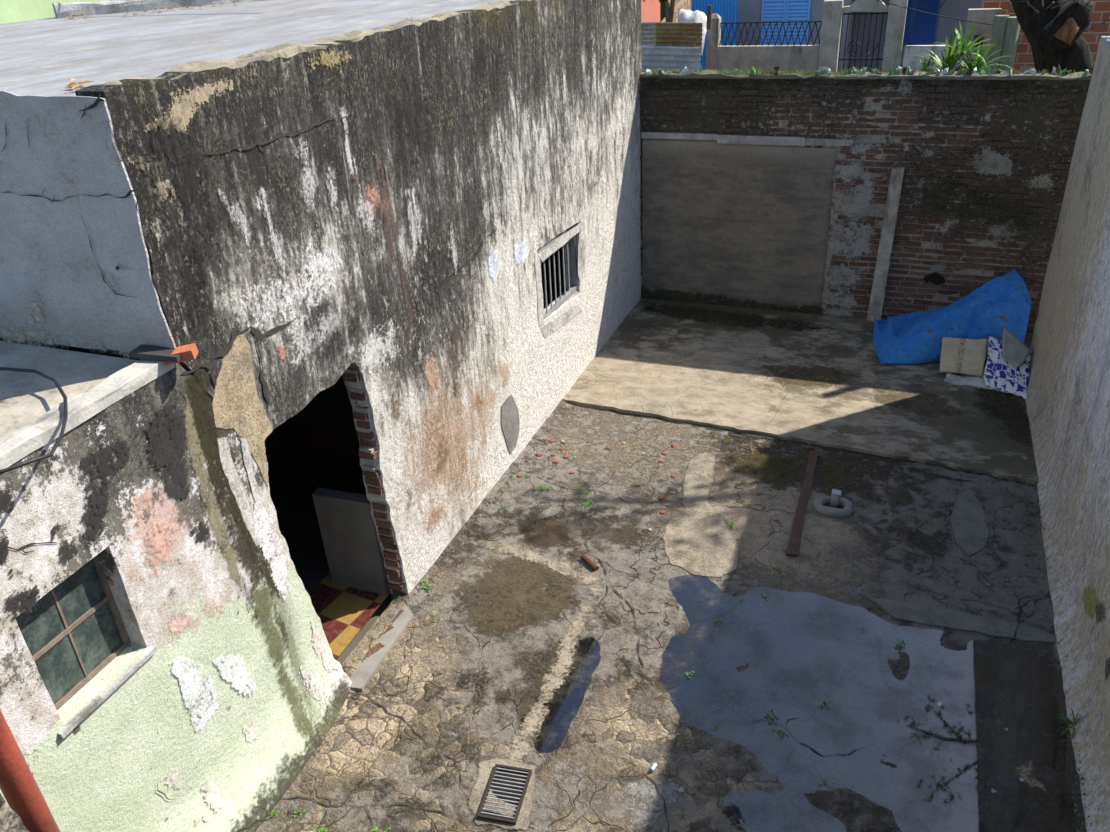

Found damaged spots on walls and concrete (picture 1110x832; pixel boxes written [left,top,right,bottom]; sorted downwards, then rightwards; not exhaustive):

crack [79,97,104,119]
crack [3,189,139,298]
water stain [106,55,399,375]
water stain [379,43,458,315]
water stain [0,485,16,516]
peeling [407,357,512,518]
water stain [0,536,40,621]
water stain [49,369,350,832]
crack [513,465,668,711]
peeling [170,653,256,735]
crack [239,696,469,831]
crack [622,757,698,832]